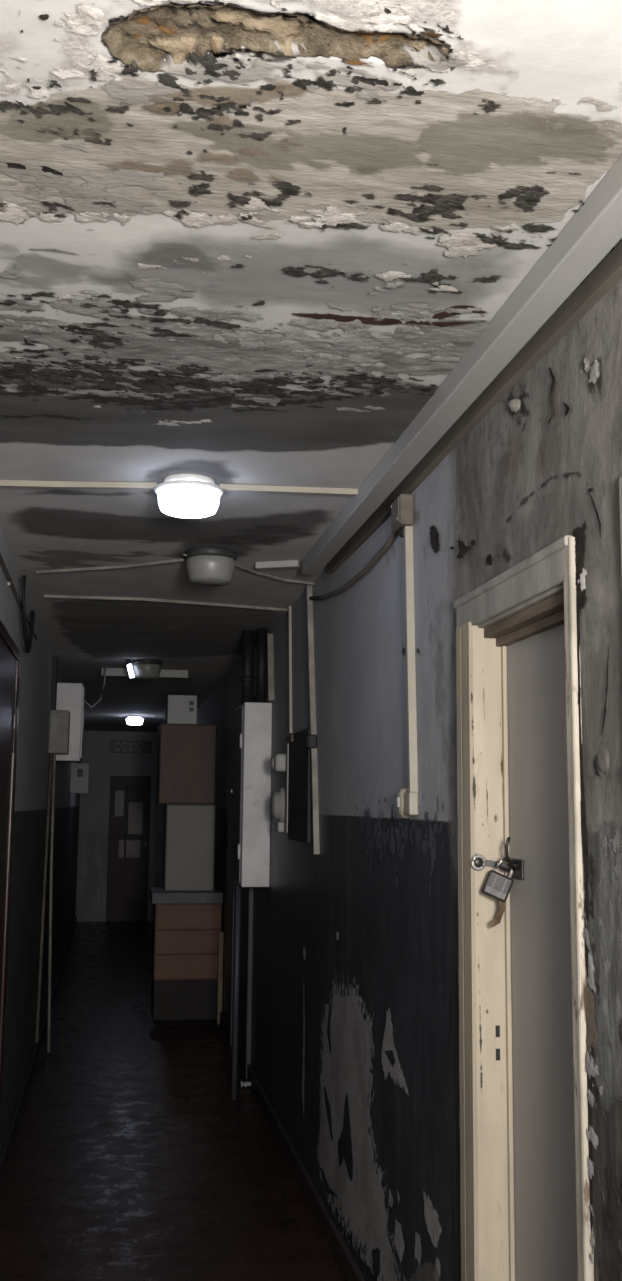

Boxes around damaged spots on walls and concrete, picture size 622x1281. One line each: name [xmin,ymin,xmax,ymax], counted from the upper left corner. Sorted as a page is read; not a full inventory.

peeling [0,0,622,258]
water stain [473,93,569,131]
water stain [578,97,622,134]
water stain [124,170,557,311]
water stain [0,291,438,452]
peeling [0,277,490,418]
spalling [503,385,529,431]
peeling [581,357,602,394]
water stain [20,509,325,545]
peeling [302,968,442,1281]